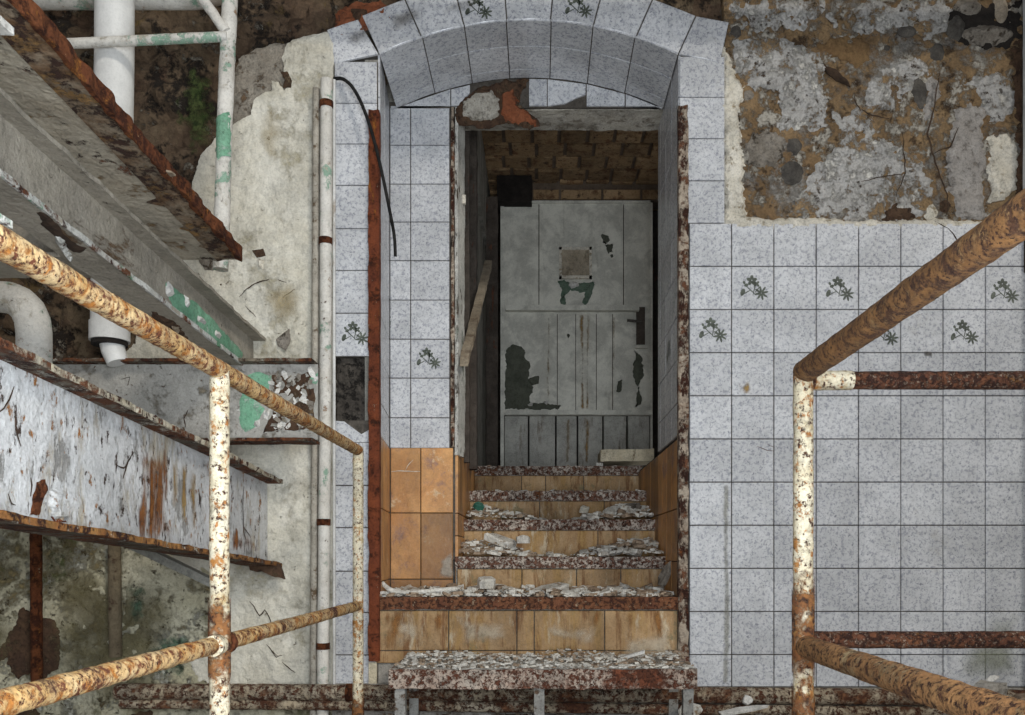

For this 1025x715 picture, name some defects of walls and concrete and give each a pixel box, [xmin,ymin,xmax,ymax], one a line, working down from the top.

flaking render [281,71,292,88]
rust [0,0,242,262]
flaking render [720,0,1023,230]
flaking render [252,249,266,269]
peeling [558,279,595,305]
peeling [237,394,305,433]
peeling [248,366,318,417]
peeling [337,358,365,420]
peeling [504,344,560,410]
peeling [616,350,644,407]
rust [0,452,209,555]
rust [230,528,282,567]